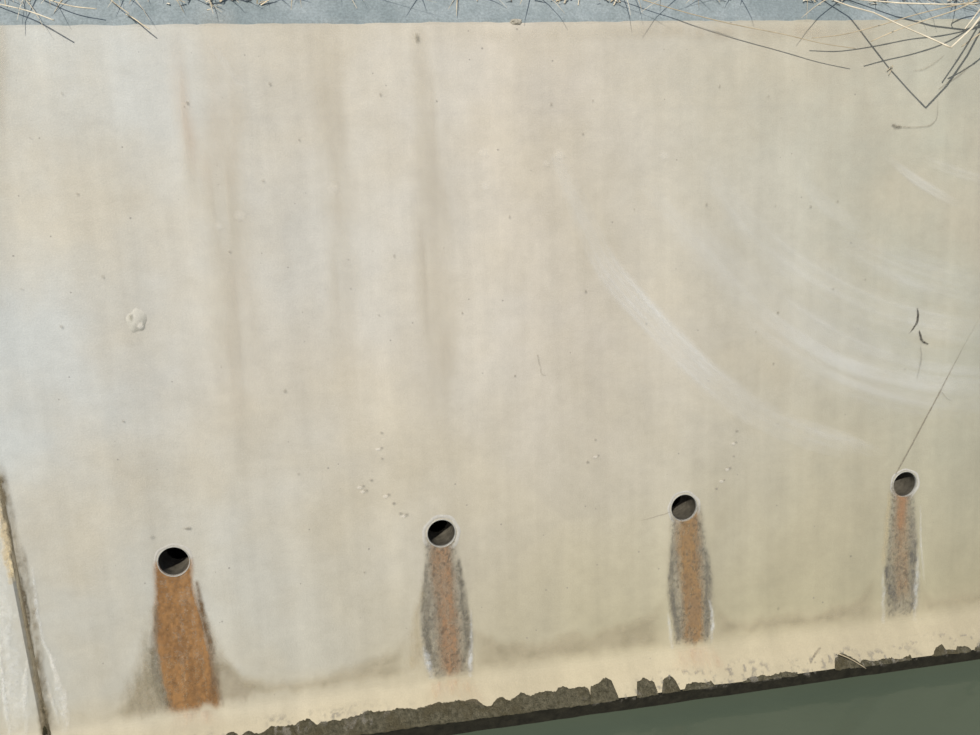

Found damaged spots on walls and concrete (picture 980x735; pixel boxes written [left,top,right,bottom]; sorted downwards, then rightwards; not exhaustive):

leakage [0,476,18,565]
leakage [28,644,50,734]
rust [130,563,219,711]
spalling [226,677,619,735]
rust [423,544,469,674]
spalling [637,675,715,698]
rust [669,514,710,642]
spalling [742,671,798,683]
spalling [835,653,912,671]
spalling [932,643,980,657]